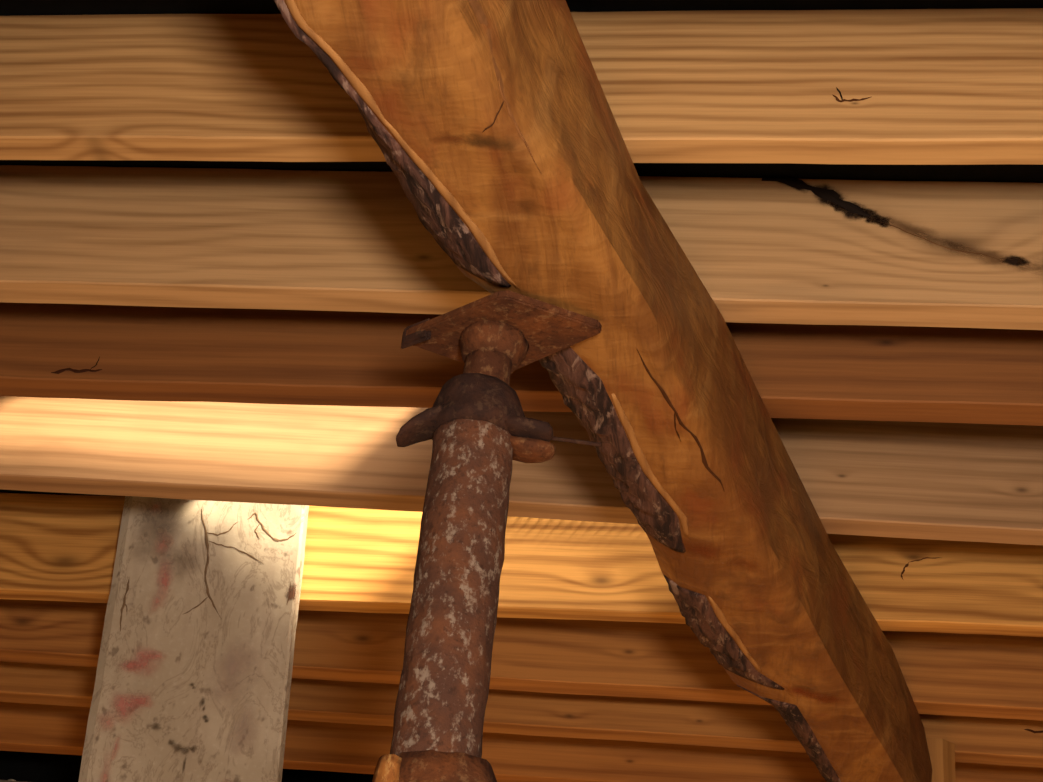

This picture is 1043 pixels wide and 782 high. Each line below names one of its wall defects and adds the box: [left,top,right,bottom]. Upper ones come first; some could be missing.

crack [762,177,1029,265]
crack [637,350,724,490]
crack [184,511,297,619]